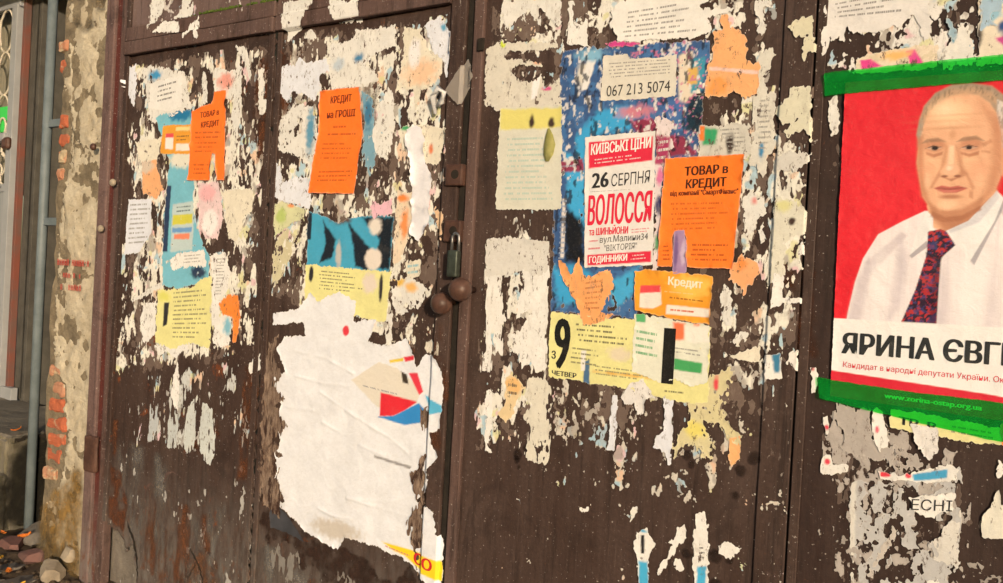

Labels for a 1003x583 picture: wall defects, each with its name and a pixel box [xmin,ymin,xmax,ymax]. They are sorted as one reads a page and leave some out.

peeling [42,364,67,480]
corrosion [109,468,127,530]